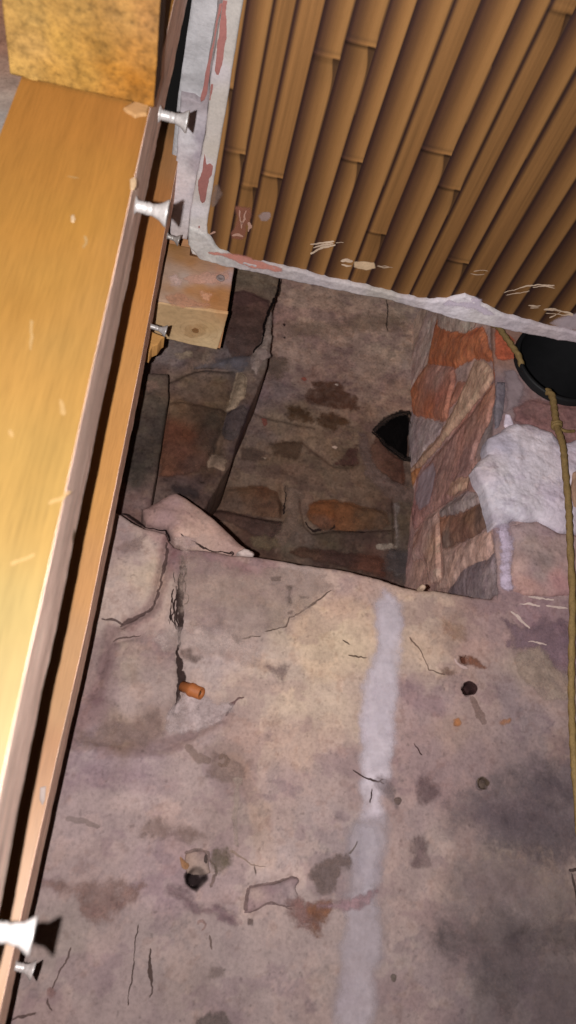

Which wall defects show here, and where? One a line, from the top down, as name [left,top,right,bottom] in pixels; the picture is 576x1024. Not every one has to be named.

peeling [200,0,227,102]
peeling [198,154,213,203]
flaking render [224,290,285,375]
flaking render [212,485,283,541]
crack [101,513,234,706]
crack [244,590,331,639]
peeling [166,694,233,733]
water stain [365,607,400,768]
spalling [184,849,229,891]
peeling [244,855,351,913]
rust [290,898,332,929]
water stain [322,816,386,1024]